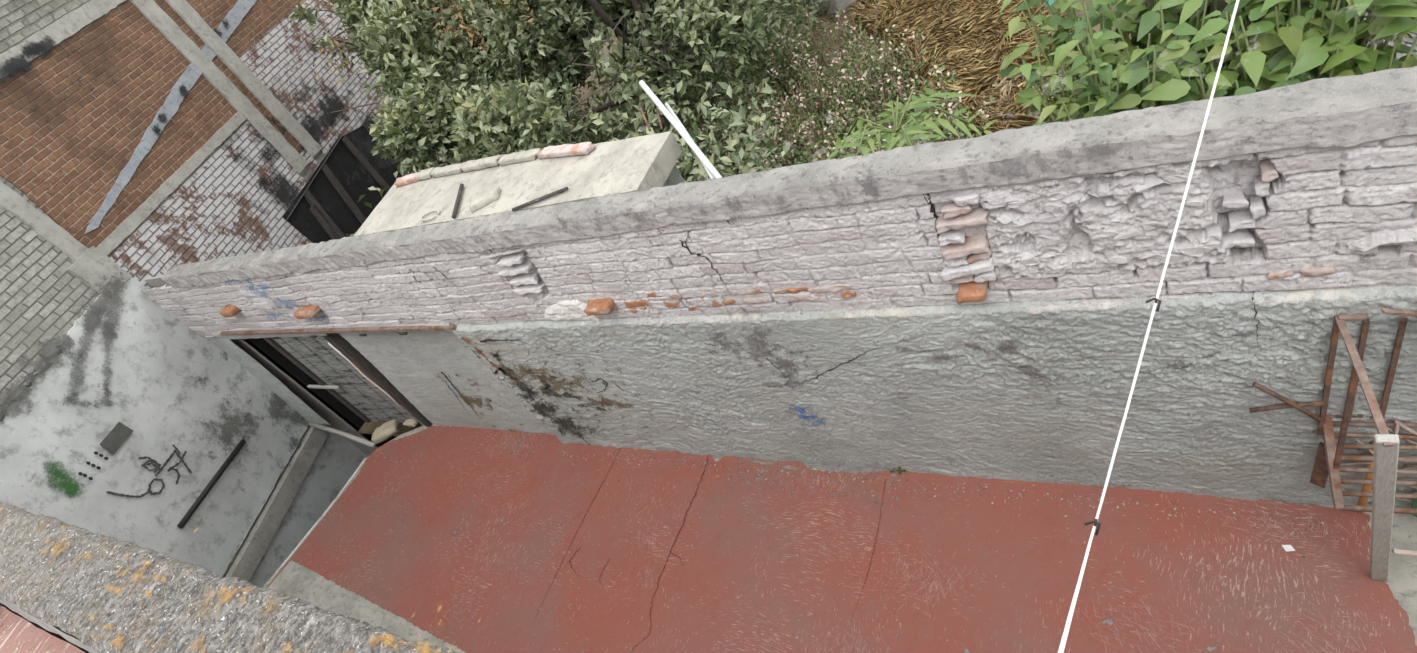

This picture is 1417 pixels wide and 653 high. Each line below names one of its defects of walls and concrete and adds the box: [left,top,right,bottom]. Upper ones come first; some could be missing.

water stain [0,35,56,94]
peeling [935,159,1279,285]
spalling [497,252,546,295]
spalling [623,284,857,313]
water stain [826,305,945,323]
water stain [1026,297,1166,314]
water stain [1221,254,1395,304]
water stain [460,394,495,427]
water stain [495,350,638,440]
crack [537,441,621,614]
crack [633,456,709,648]
crack [851,479,886,620]